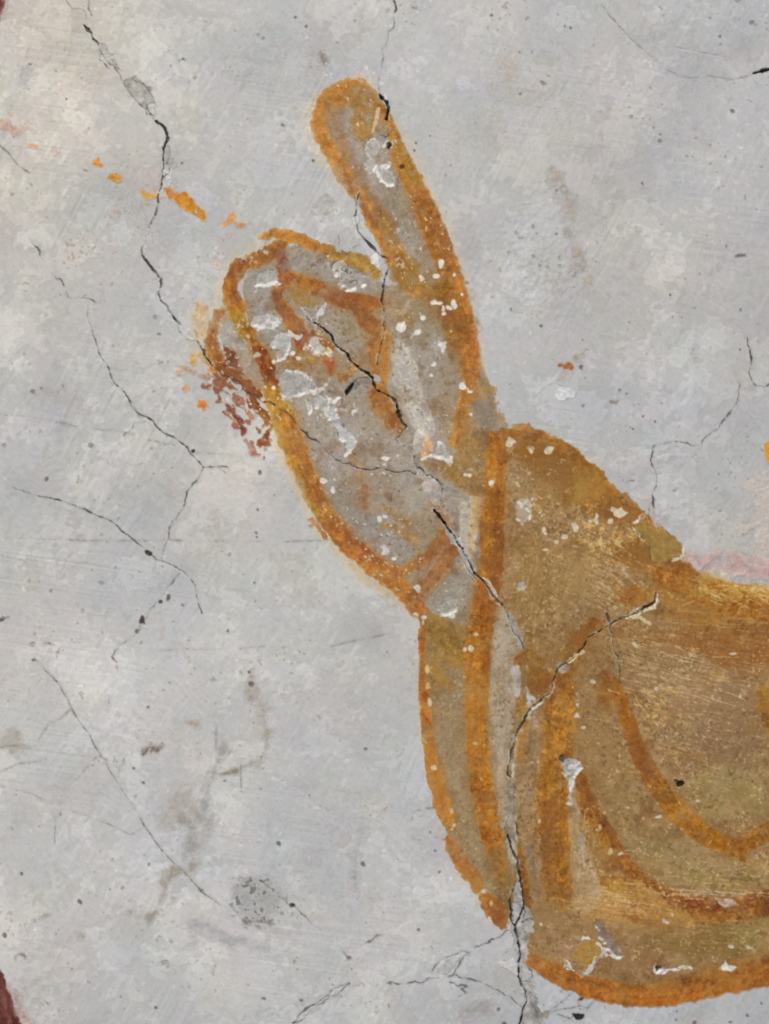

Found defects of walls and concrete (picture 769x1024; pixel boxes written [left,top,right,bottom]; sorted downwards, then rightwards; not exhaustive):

peeling [255,270,282,293]
peeling [327,255,368,293]
peeling [396,293,464,339]
peeling [251,310,359,458]
crack [14,239,230,704]
peeling [420,441,454,467]
crack [627,337,769,567]
crack [66,0,661,1024]
peeling [560,755,584,807]
peeling [564,921,623,979]
peeling [653,965,694,975]
peeling [719,944,752,972]